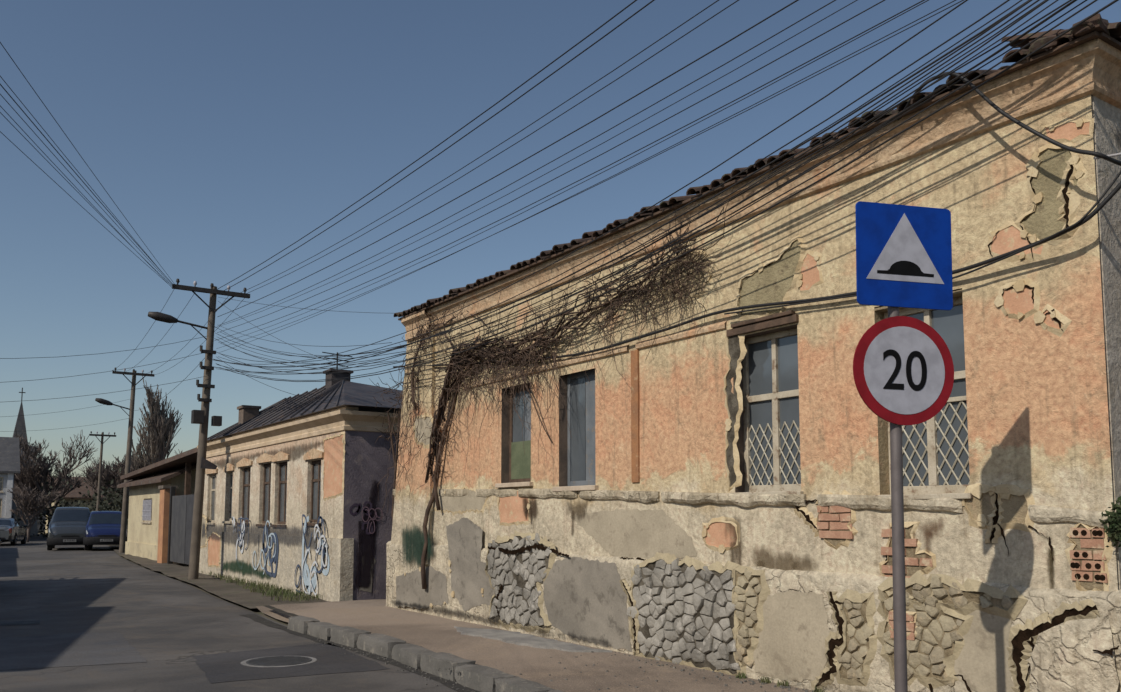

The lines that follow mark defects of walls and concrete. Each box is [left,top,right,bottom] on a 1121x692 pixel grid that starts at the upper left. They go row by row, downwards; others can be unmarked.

peeling [988,118,1094,263]
peeling [736,234,824,320]
peeling [994,278,1072,337]
flaking render [396,486,552,626]
crack [985,493,1053,562]
flaking render [1065,523,1113,591]
flaking render [627,558,762,670]
crack [811,591,857,692]
flaking render [838,592,964,687]
crack [928,674,972,692]
crack [1007,598,1100,692]
crack [1093,645,1119,656]